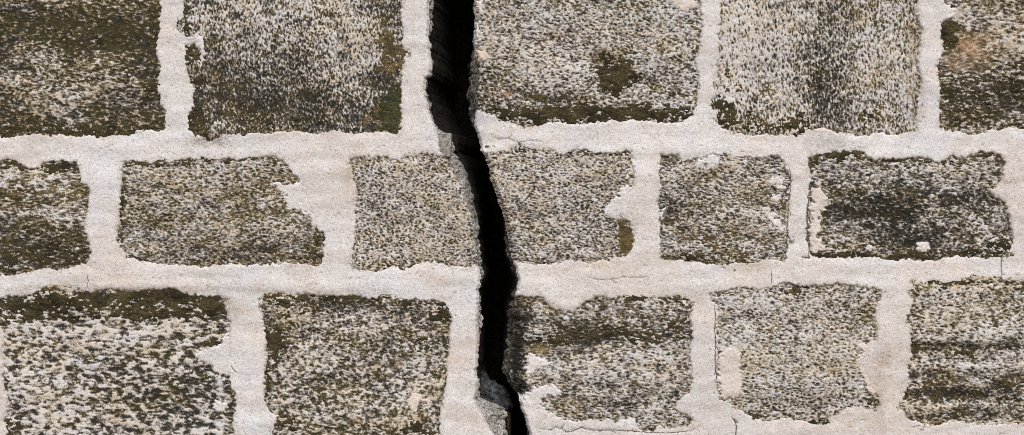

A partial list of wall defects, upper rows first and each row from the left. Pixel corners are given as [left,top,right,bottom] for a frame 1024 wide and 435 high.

crack [425,0,699,435]